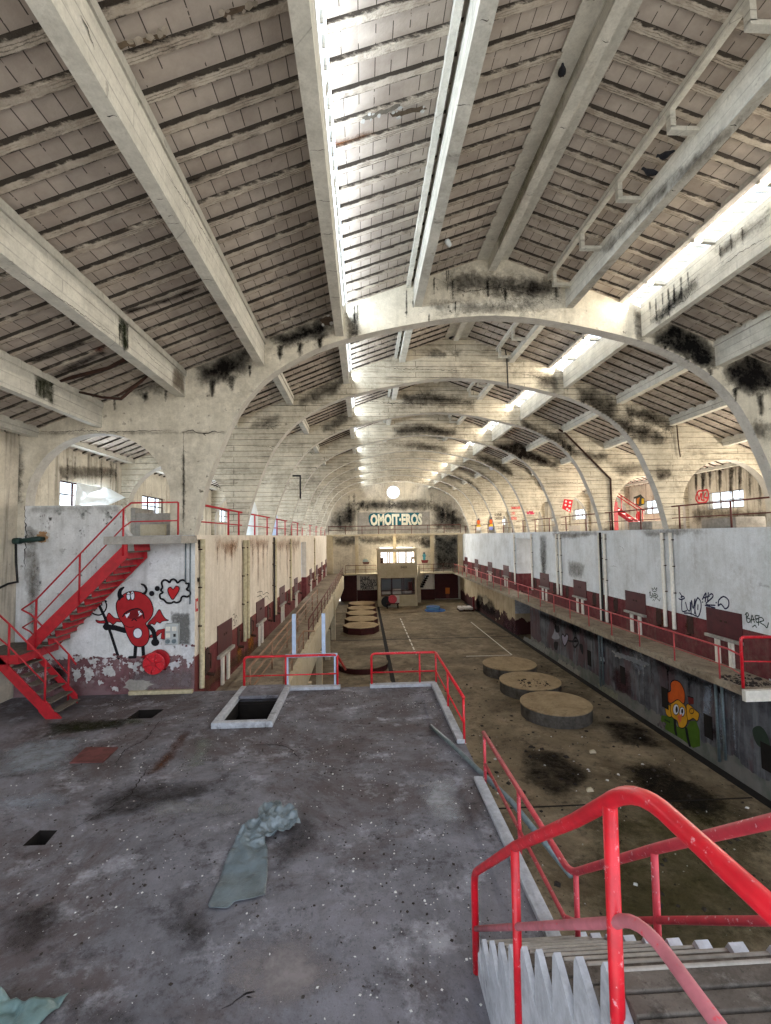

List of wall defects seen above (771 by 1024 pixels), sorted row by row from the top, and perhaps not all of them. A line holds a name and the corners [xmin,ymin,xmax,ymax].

water stain [433,270,557,312]
mould [198,348,251,396]
water stain [636,273,771,436]
peeling [71,653,145,694]
peeling [168,644,208,676]
rust [149,736,186,774]
water stain [525,751,587,794]
water stain [631,767,721,813]